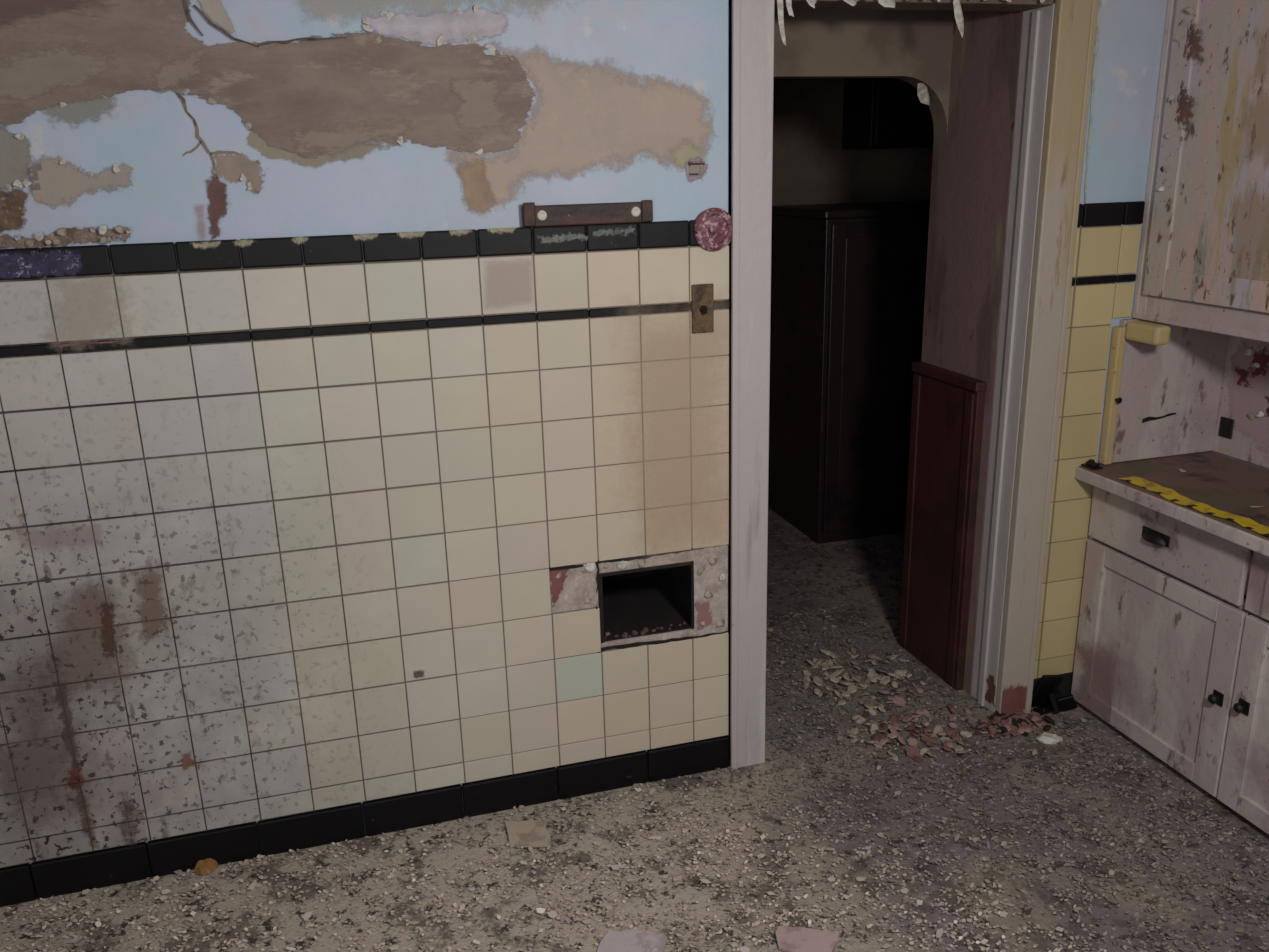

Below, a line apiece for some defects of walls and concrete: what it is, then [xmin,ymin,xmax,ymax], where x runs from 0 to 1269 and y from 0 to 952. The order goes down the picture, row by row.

peeling [777,0,817,45]
peeling [843,0,908,8]
peeling [924,0,964,38]
peeling [1179,7,1204,65]
crack [175,92,240,177]
peeling [0,0,536,249]
peeling [1156,81,1195,191]
peeling [1229,341,1269,452]
spalling [549,545,728,651]
water stain [55,684,80,770]
spalling [985,674,1077,715]